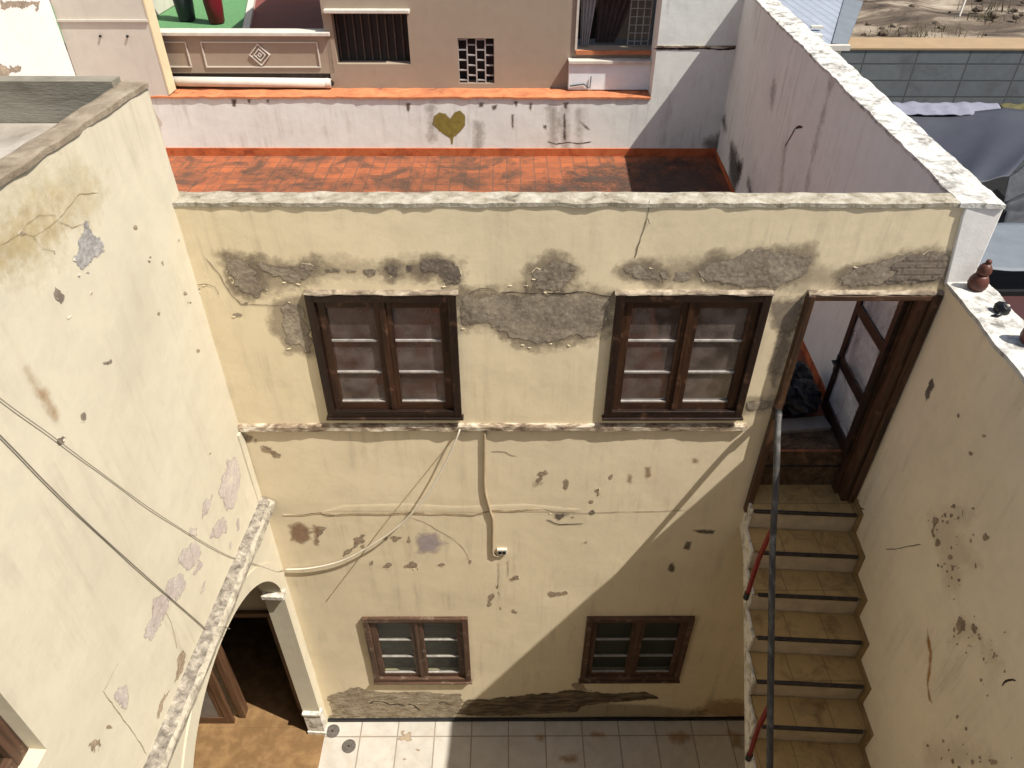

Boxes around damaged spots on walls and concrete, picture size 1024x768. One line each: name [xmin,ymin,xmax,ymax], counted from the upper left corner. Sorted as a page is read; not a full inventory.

crack [1,192,95,254]
flaking render [73,220,105,277]
crack [634,201,650,259]
flaking render [622,246,815,290]
flaking render [840,250,950,287]
flaking render [226,258,610,354]
peeling [142,457,241,640]
peeling [928,504,974,587]
peeling [953,616,997,663]
flaking render [457,683,659,717]